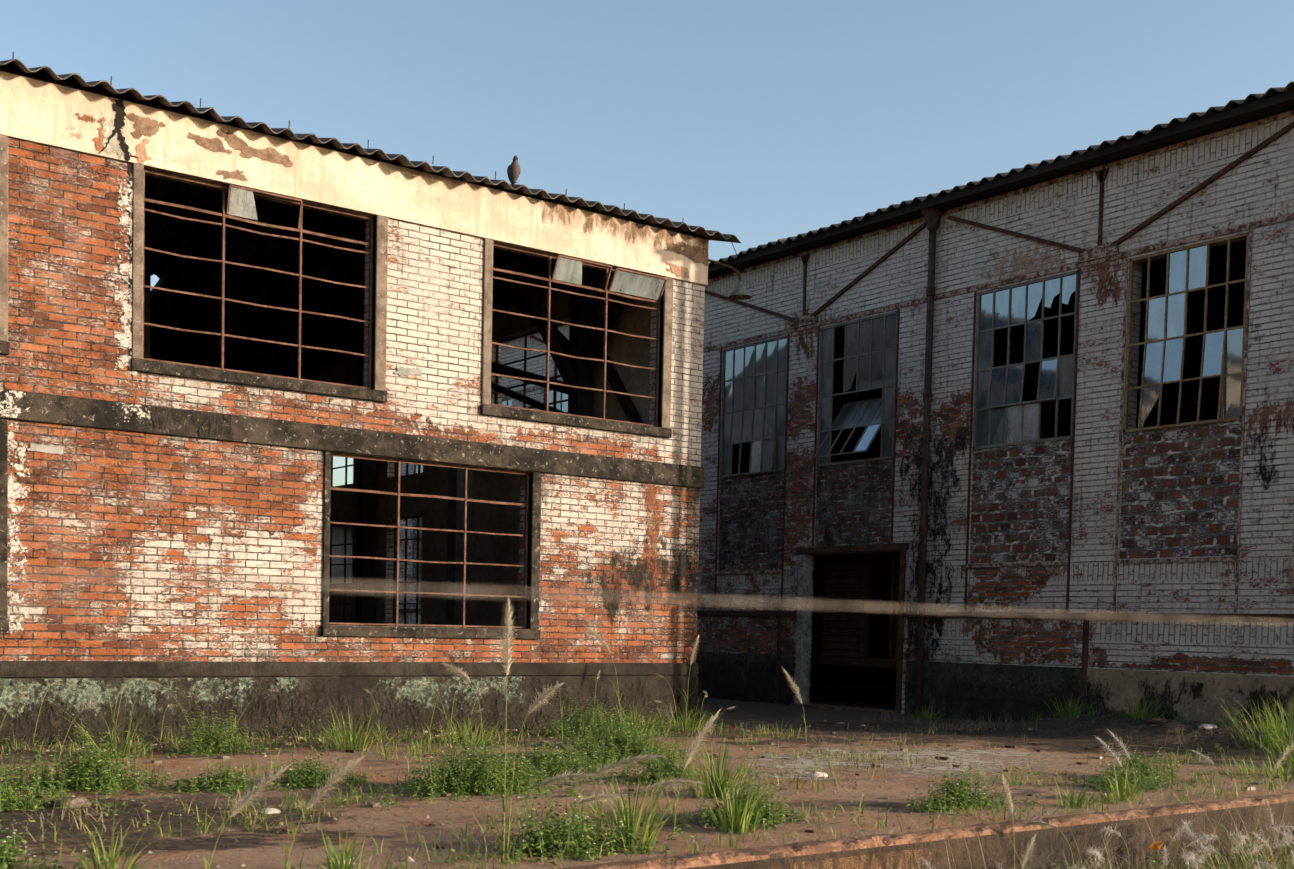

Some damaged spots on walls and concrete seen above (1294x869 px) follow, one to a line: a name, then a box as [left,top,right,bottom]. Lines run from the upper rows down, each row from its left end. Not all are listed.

flaking render [126,113,166,164]
flaking render [187,129,293,181]
peeling [0,117,142,404]
crack [98,100,138,359]
peeling [701,373,722,436]
mould [1245,430,1279,490]
peeling [0,420,324,660]
water stain [582,537,699,626]
water stain [897,423,970,660]
peeling [961,562,1294,676]
peeling [0,678,253,720]
water stain [0,655,1294,780]